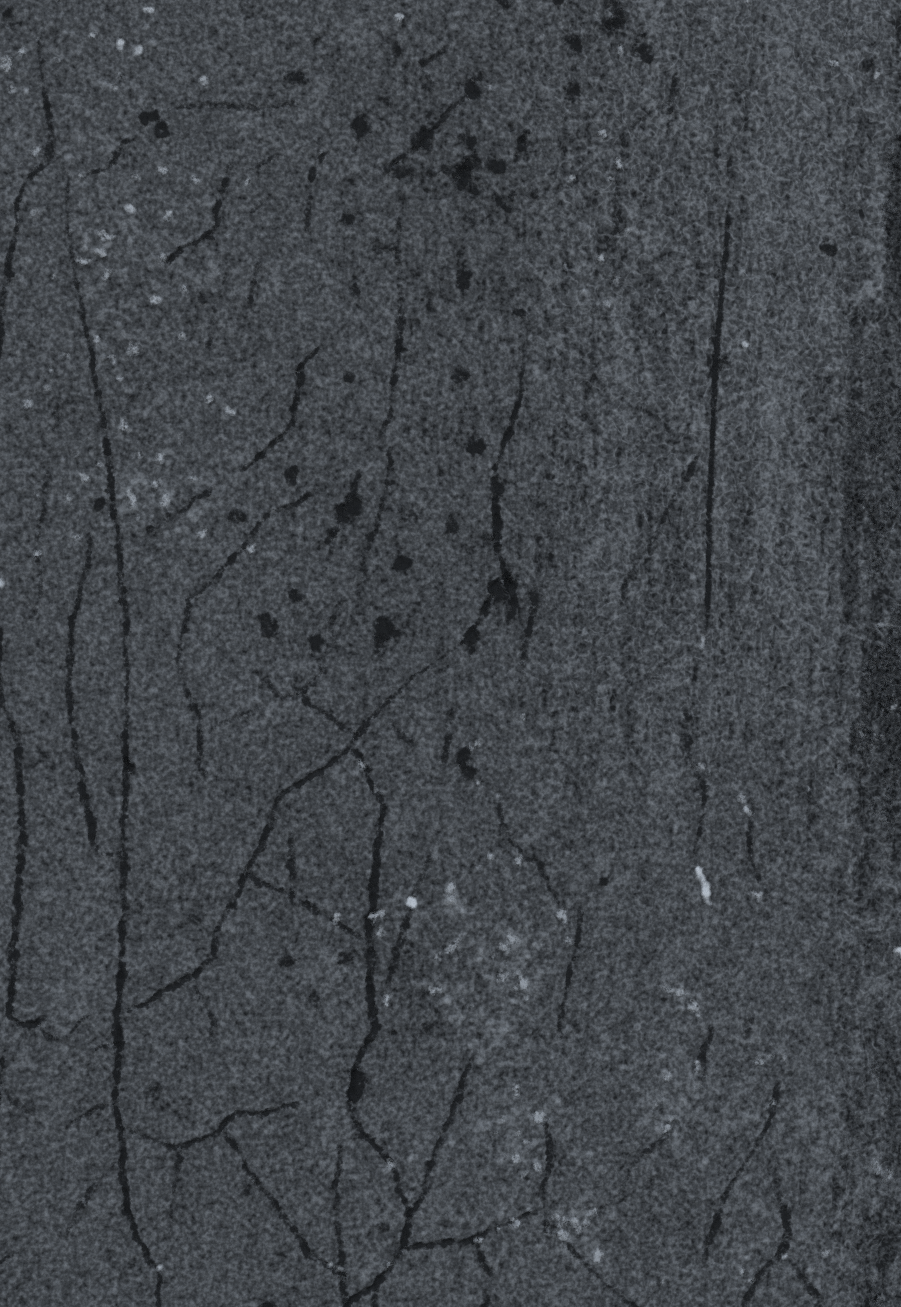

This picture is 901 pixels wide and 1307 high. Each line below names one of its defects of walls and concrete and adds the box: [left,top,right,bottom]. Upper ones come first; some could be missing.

crack [620,210,731,635]
crack [0,40,639,1307]
crack [684,710,709,854]
crack [746,811,768,894]
crack [697,1027,714,1080]
crack [643,1129,673,1154]
crack [704,1083,780,1260]
crack [742,1179,821,1307]